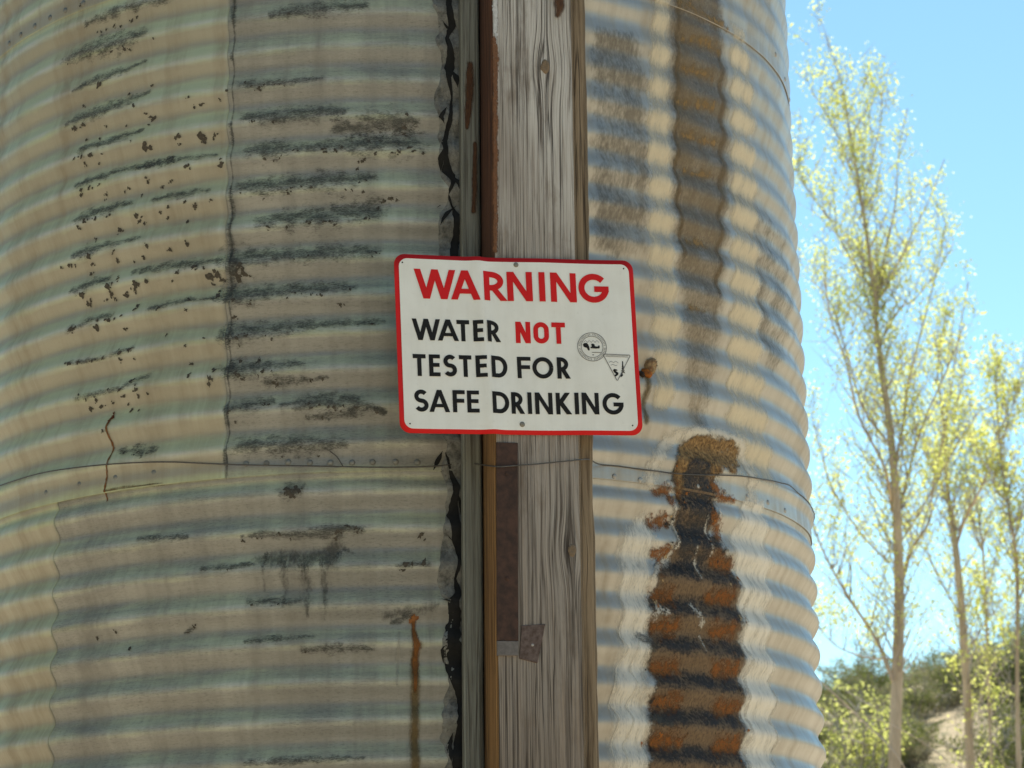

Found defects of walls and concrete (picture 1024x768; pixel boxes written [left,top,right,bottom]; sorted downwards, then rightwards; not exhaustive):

corrosion [101,412,158,501]
corrosion [636,434,750,768]
corrosion [386,612,422,768]